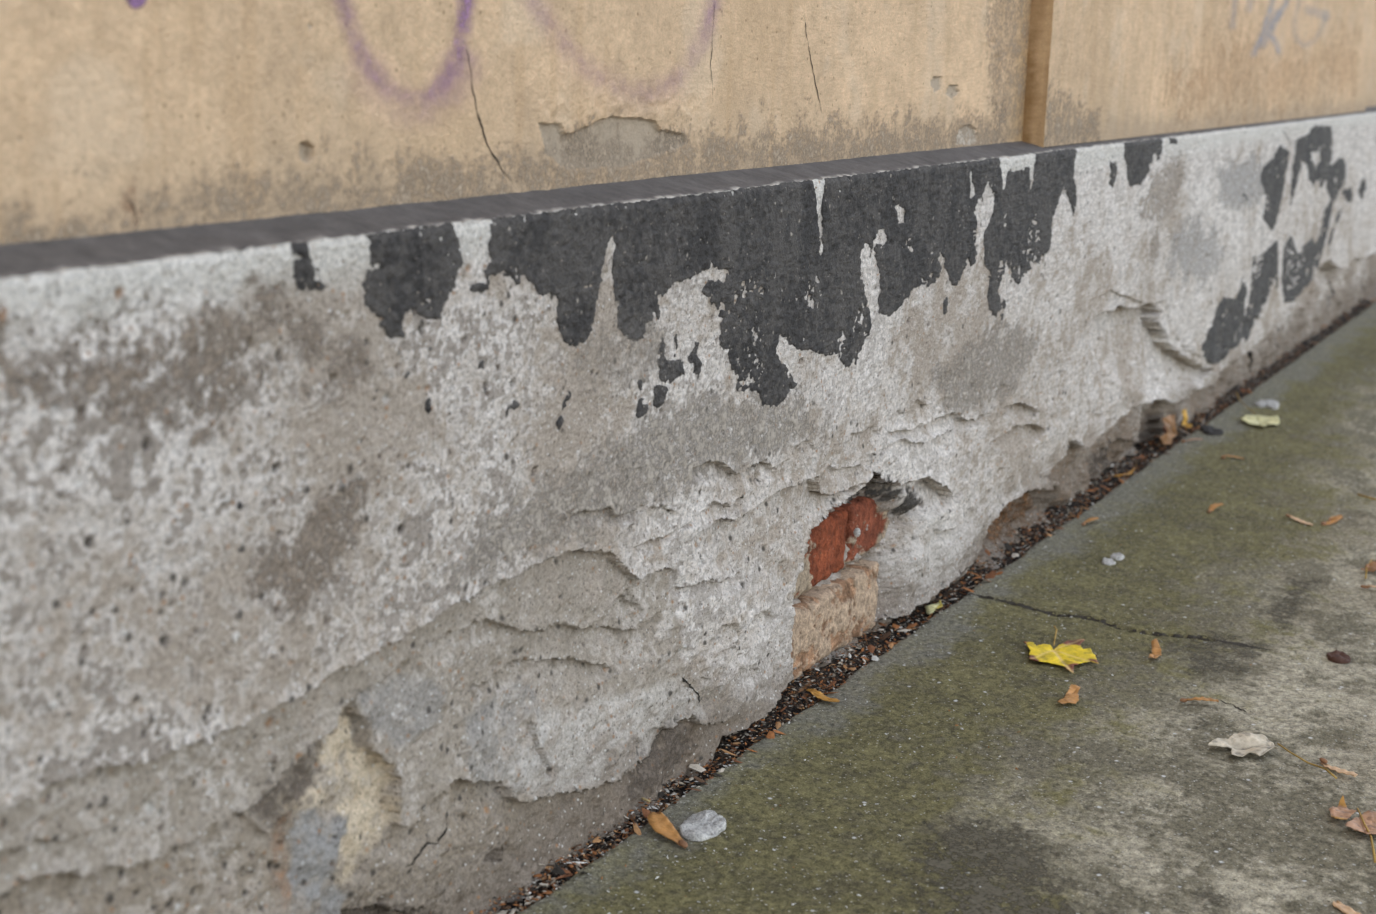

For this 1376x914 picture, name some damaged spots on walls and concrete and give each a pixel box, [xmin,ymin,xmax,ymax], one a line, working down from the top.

crack [466,49,509,178]
spalling [538,115,685,169]
peeling [291,242,326,291]
peeling [362,124,1077,418]
peeling [556,391,571,431]
spalling [950,125,1376,584]
spalling [0,402,1047,914]
crack [965,593,1269,650]